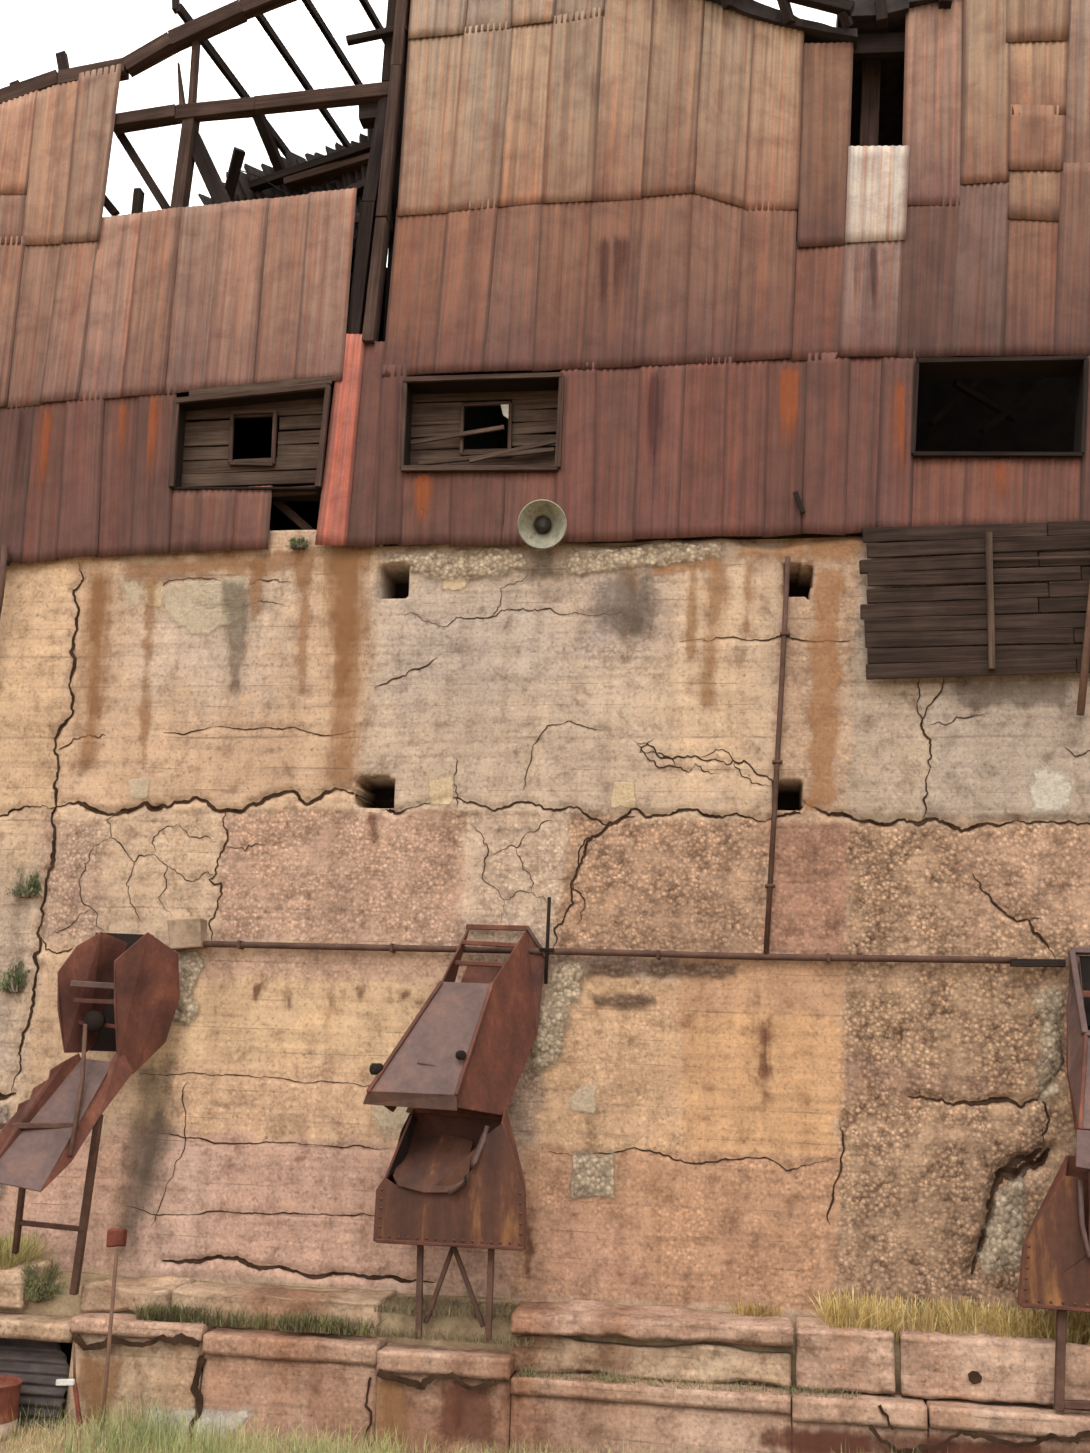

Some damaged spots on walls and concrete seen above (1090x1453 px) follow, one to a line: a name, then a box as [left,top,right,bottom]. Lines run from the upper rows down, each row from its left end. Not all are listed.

corrosion [780,369,798,432]
corrosion [415,475,431,515]
spalling [390,547,527,580]
spalling [566,540,723,575]
crack [0,564,1090,1100]
spalling [530,962,737,1071]
spalling [1036,987,1063,1100]
crack [128,1072,388,1223]
crack [908,1021,1064,1275]
crack [162,1254,435,1283]
spalling [977,1177,1025,1274]
crack [72,1333,206,1436]